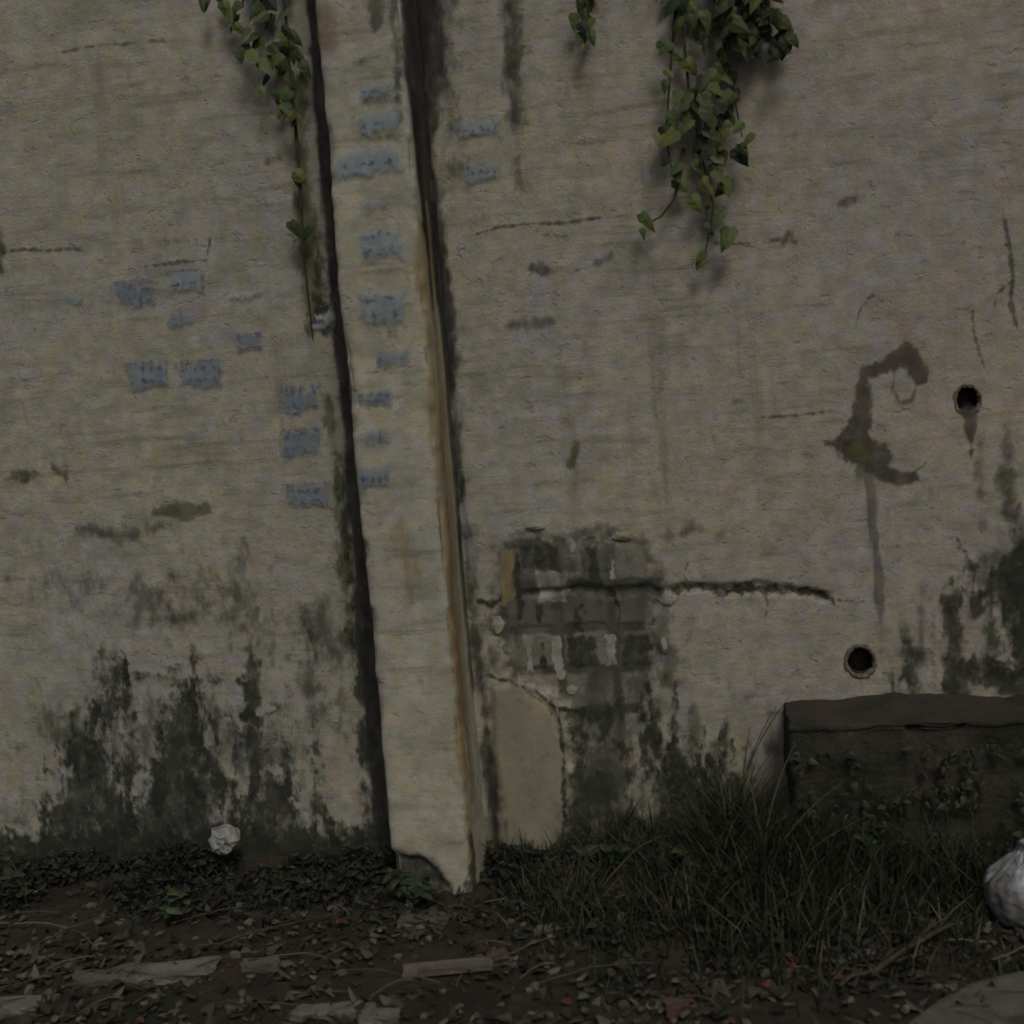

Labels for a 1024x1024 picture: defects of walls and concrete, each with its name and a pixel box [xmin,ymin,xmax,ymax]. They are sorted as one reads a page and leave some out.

water stain [0,0,399,868]
water stain [826,342,929,484]
water stain [961,406,977,456]
crack [477,591,532,608]
flaking render [491,523,676,798]
crack [611,563,864,621]
water stain [890,527,1024,696]
water stain [556,670,740,855]